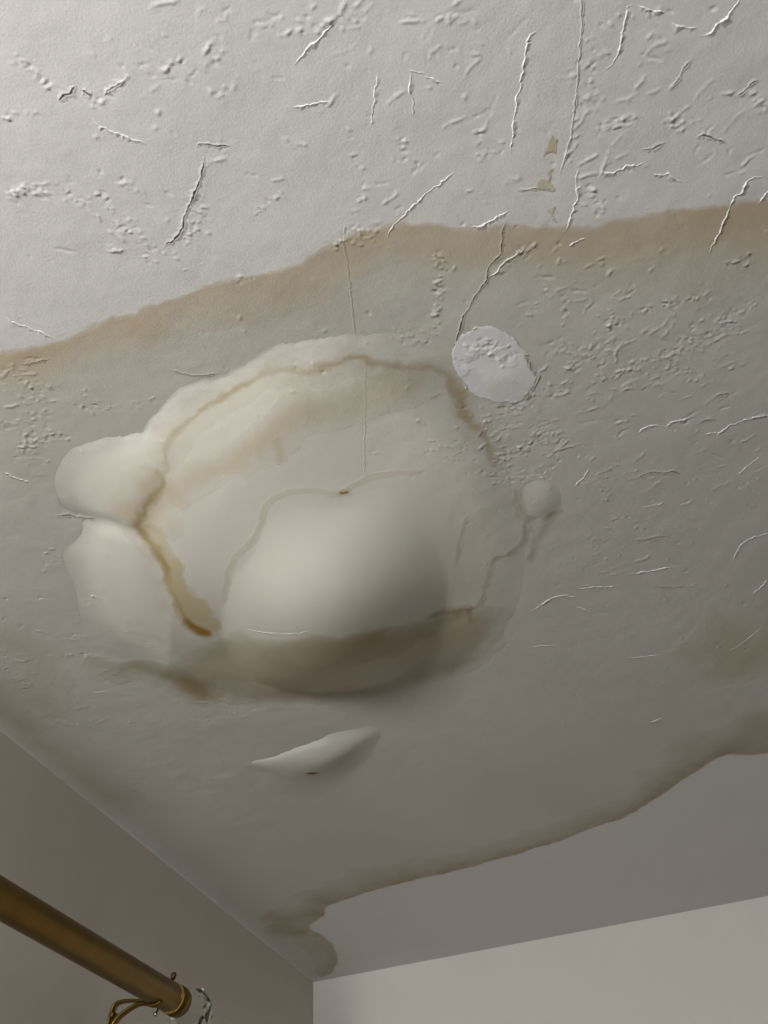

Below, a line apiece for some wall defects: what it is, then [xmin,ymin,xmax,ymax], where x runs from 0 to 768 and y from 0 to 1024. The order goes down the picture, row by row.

crack [294,24,335,66]
crack [370,73,380,128]
crack [163,141,232,248]
crack [384,172,456,242]
crack [452,0,740,349]
crack [709,176,768,254]
peeling [451,326,540,406]
crack [638,414,768,437]
water stain [0,197,768,978]